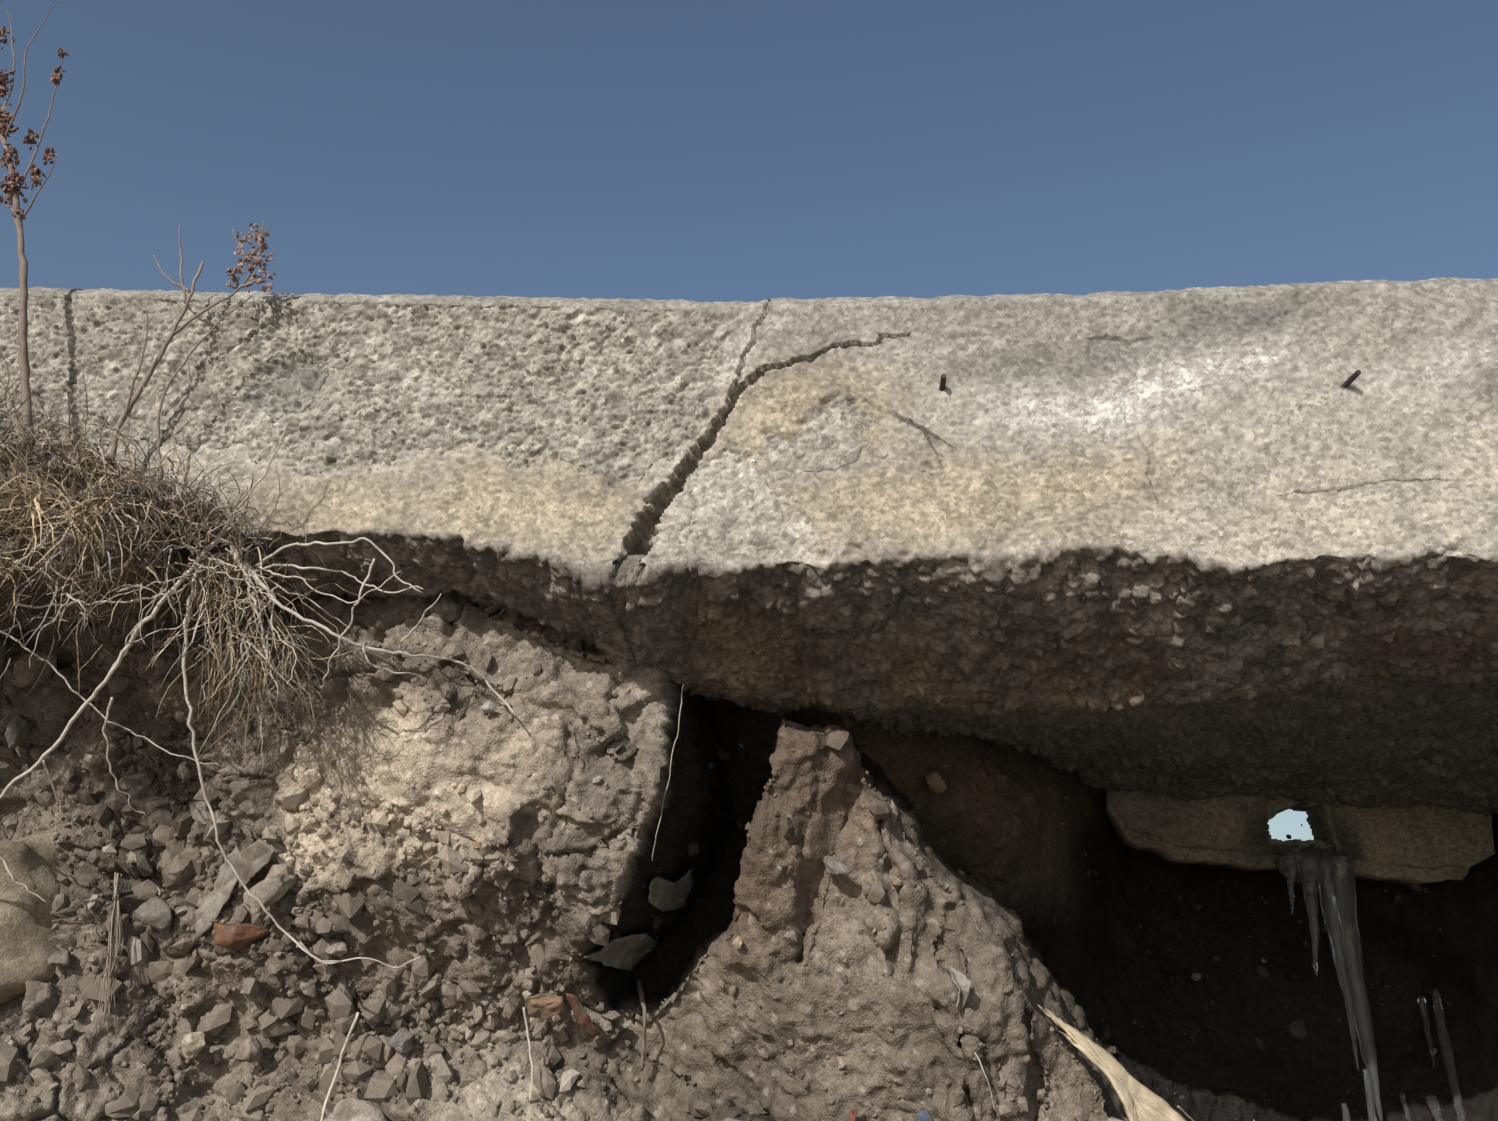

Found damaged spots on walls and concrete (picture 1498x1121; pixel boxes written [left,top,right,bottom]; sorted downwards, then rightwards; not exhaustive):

crack [624,298,909,556]
crack [853,392,956,472]